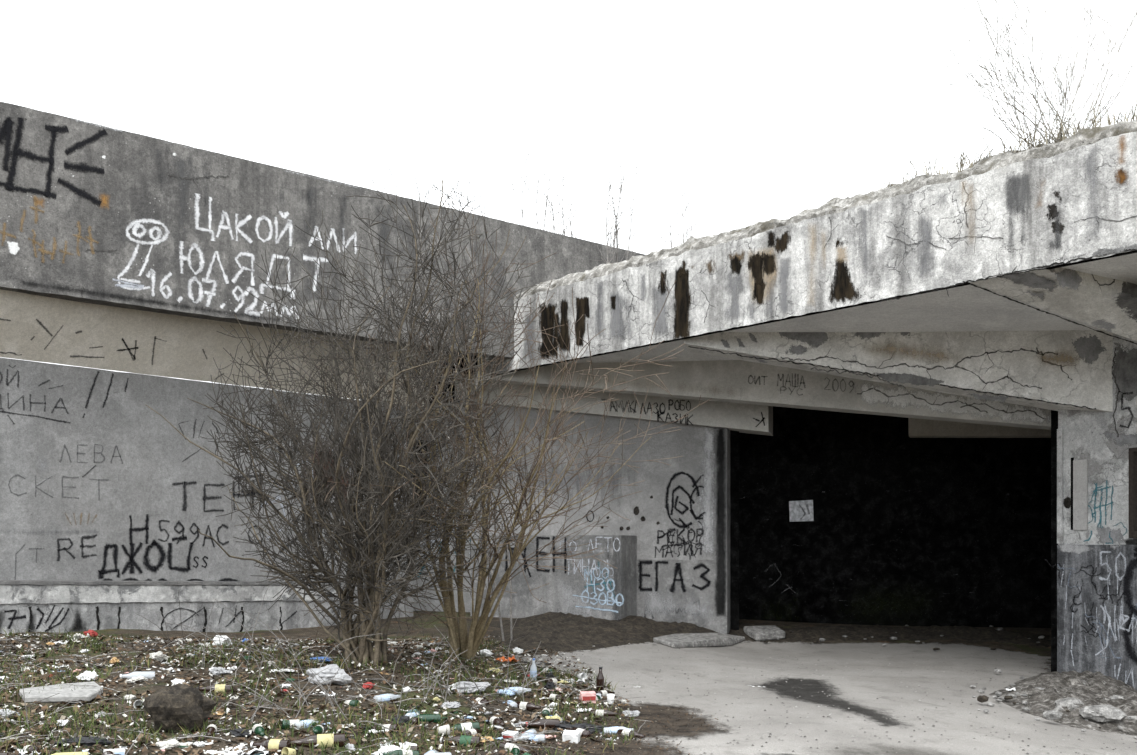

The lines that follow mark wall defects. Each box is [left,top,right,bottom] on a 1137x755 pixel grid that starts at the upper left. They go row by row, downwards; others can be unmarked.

rust [1115,139,1128,184]
water stain [1006,175,1029,247]
water stain [525,283,630,360]
water stain [641,260,691,339]
water stain [726,230,791,319]
crack [688,182,1137,437]